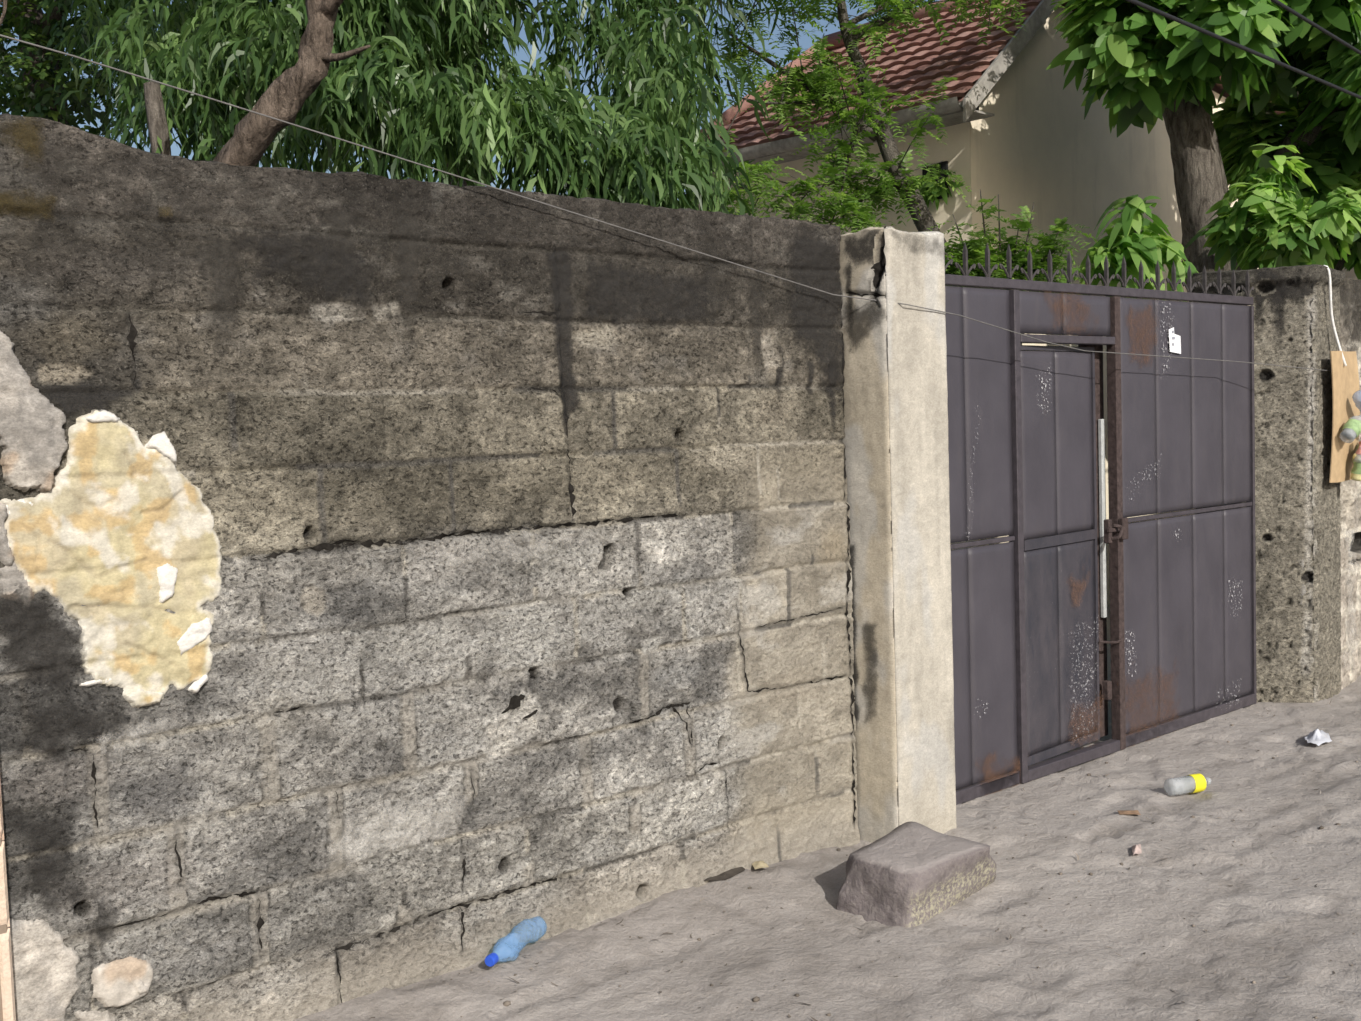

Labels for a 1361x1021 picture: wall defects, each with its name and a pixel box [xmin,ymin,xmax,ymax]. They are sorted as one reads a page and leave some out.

damp [546,235,735,425]
spalling [871,229,886,291]
damp [1254,268,1317,336]
peeling [0,330,222,708]
damp [0,590,122,756]
damp [849,546,877,721]
damp [8,808,115,939]